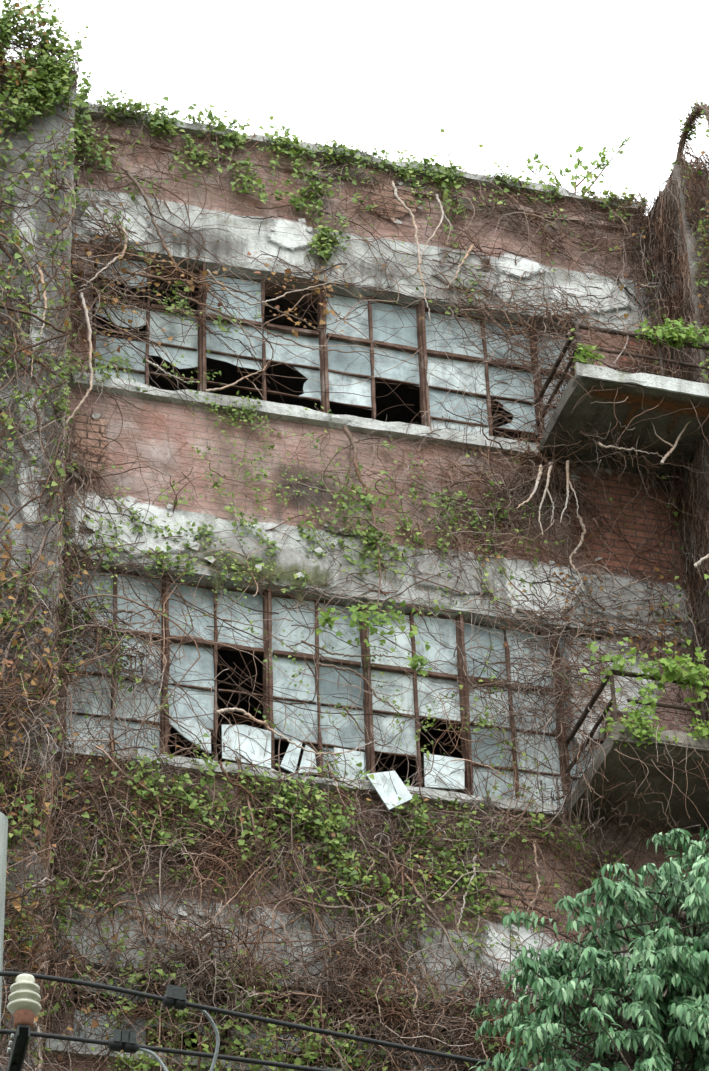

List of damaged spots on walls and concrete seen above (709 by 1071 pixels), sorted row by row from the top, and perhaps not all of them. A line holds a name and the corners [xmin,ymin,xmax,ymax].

flaking render [320,160,426,224]
peeling [80,196,155,246]
peeling [267,218,313,250]